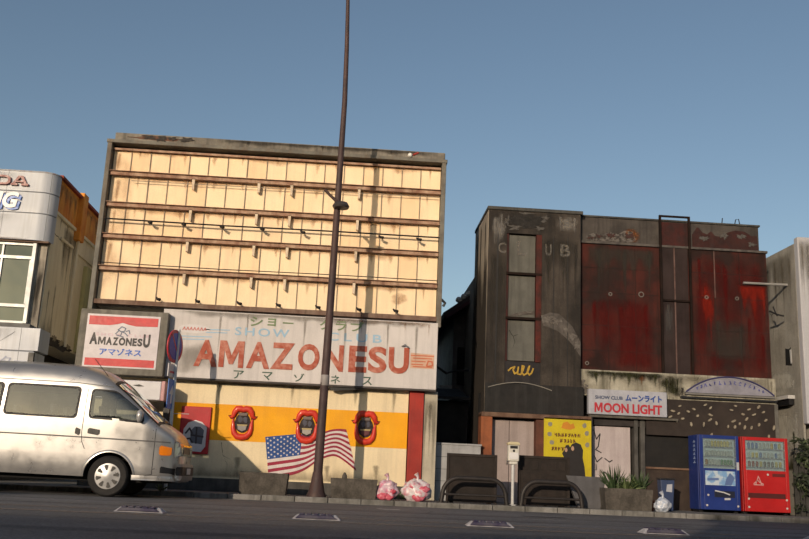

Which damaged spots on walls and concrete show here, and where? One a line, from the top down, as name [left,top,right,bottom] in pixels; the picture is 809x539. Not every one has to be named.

peeling [586,231,637,243]
peeling [692,227,758,251]